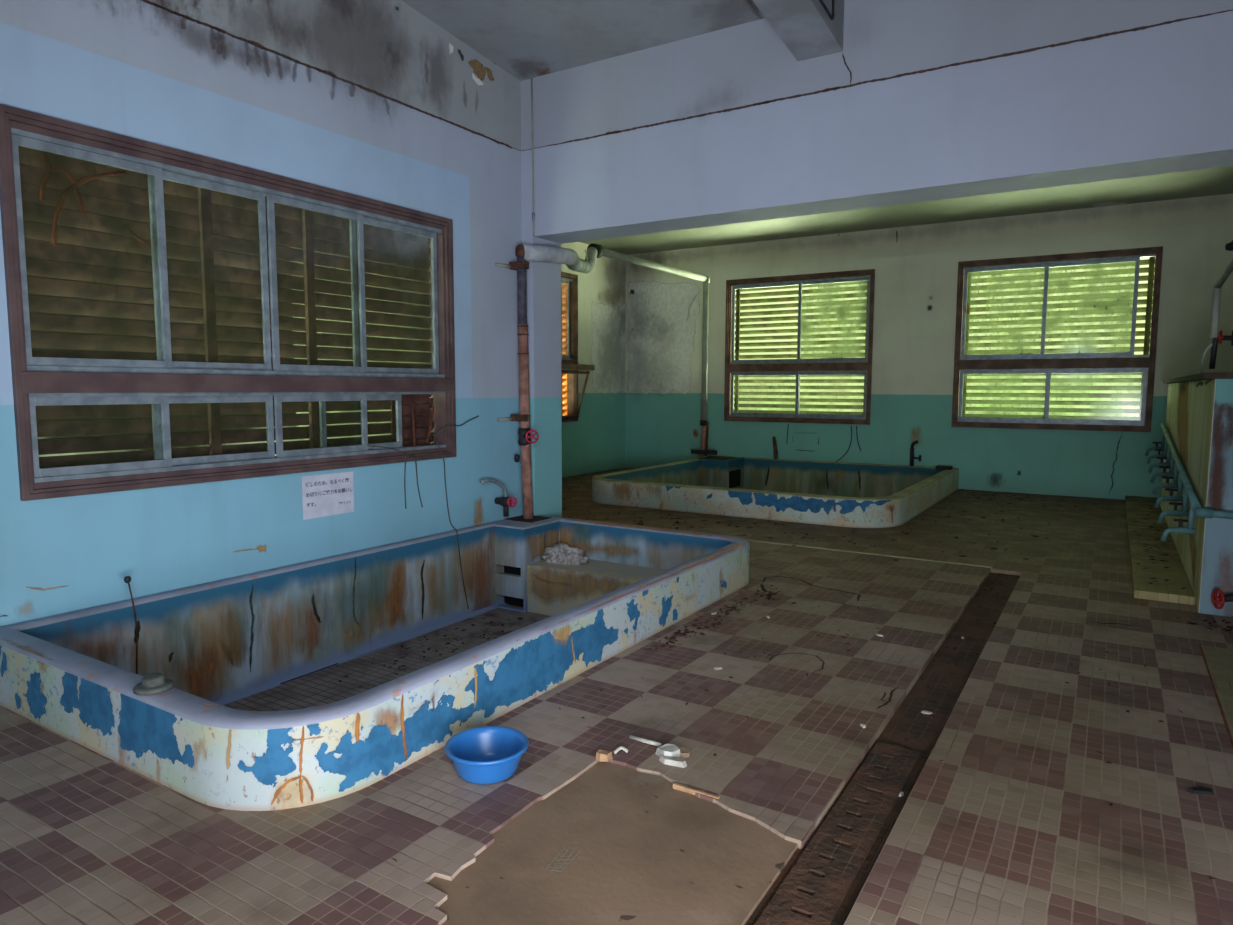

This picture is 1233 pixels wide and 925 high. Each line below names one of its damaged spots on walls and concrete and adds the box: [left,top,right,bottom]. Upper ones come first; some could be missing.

crack [1109,433,1123,495]
peeling [728,491,892,515]
corrosion [368,569,404,627]
corrosion [185,654,216,698]
peeling [15,670,195,768]